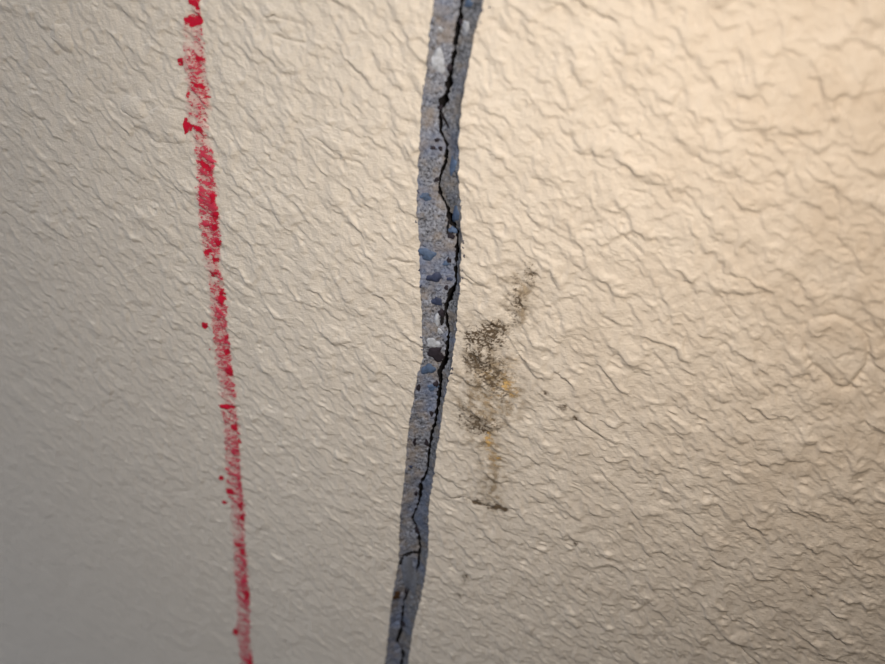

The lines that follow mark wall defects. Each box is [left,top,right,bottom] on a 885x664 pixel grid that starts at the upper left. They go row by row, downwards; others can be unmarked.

crack [385,0,490,664]
damp [459,349,521,426]
damp [472,458,508,512]